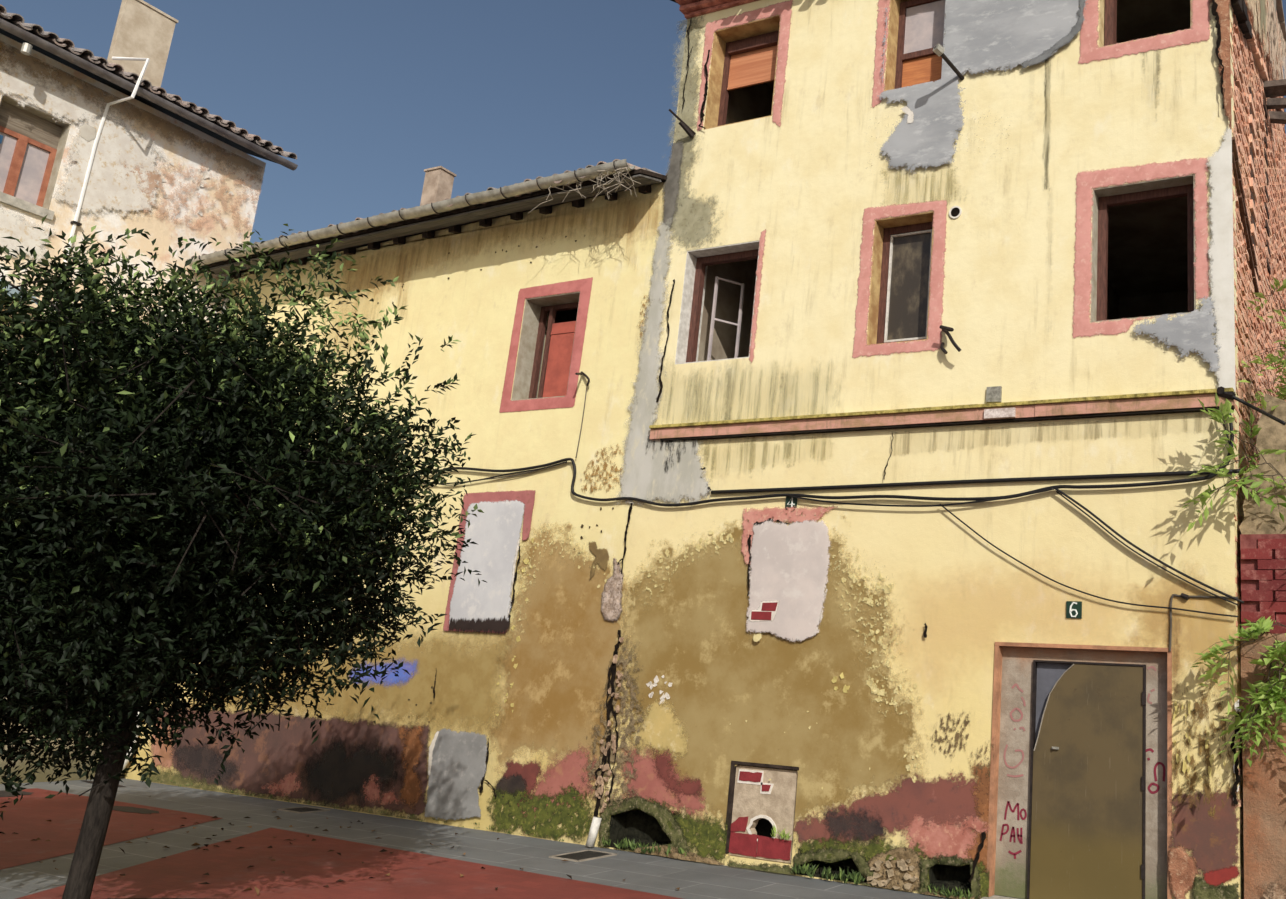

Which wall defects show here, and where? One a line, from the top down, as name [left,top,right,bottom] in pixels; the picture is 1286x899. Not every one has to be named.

peeling [0,206,56,263]
peeling [0,45,259,235]
peeling [901,106,914,123]
water stain [196,521,923,843]
crack [594,630,621,817]
peeling [443,445,837,716]
peeling [494,637,994,899]
peeling [830,550,921,716]
peeling [1168,687,1241,899]